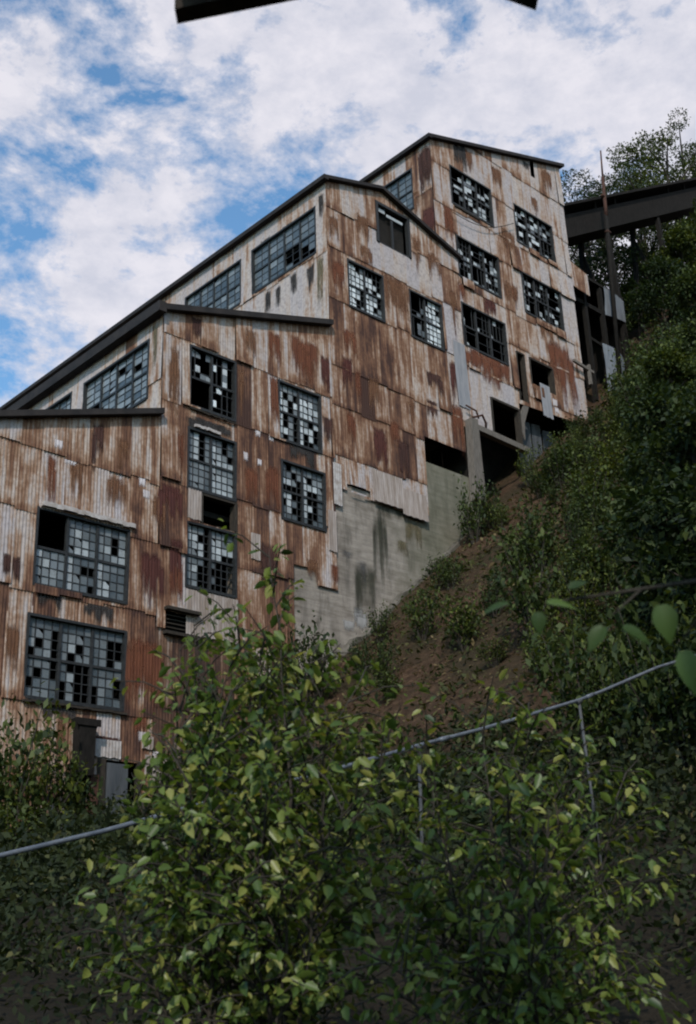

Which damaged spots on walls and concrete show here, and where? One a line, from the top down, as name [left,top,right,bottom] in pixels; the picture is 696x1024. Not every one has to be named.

corrosion [413,147,453,237]
corrosion [491,166,502,185]
corrosion [542,170,552,189]
corrosion [357,214,372,264]
corrosion [383,275,410,309]
corrosion [246,329,330,393]
corrosion [270,376,279,422]
corrosion [48,455,56,503]
corrosion [71,424,104,492]
corrosion [107,439,128,499]
corrosion [141,483,183,608]
damp [356,506,419,599]